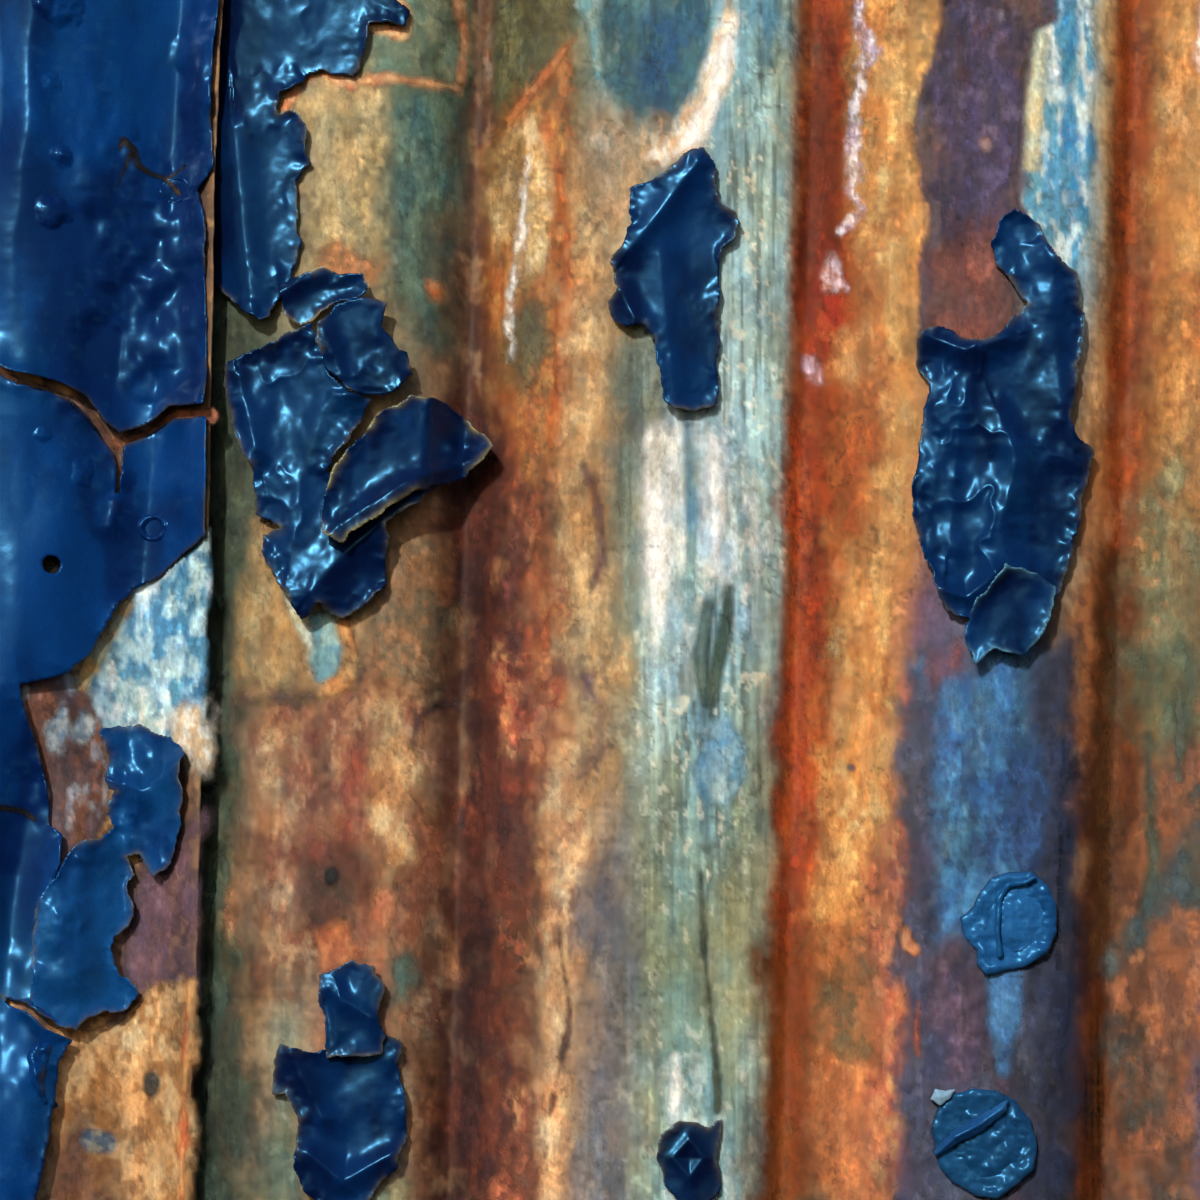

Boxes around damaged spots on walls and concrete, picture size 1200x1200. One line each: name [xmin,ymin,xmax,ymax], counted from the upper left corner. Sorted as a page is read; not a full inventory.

corrosion [368,0,411,40]
peeling [30,535,212,1031]
peeling [214,0,493,619]
corrosion [240,42,637,1200]
peeling [608,147,740,411]
corrosion [753,0,926,1200]
peeling [911,208,1095,664]
corrosion [1073,0,1200,1200]
peeling [272,959,408,1200]
peeling [656,1119,722,1200]